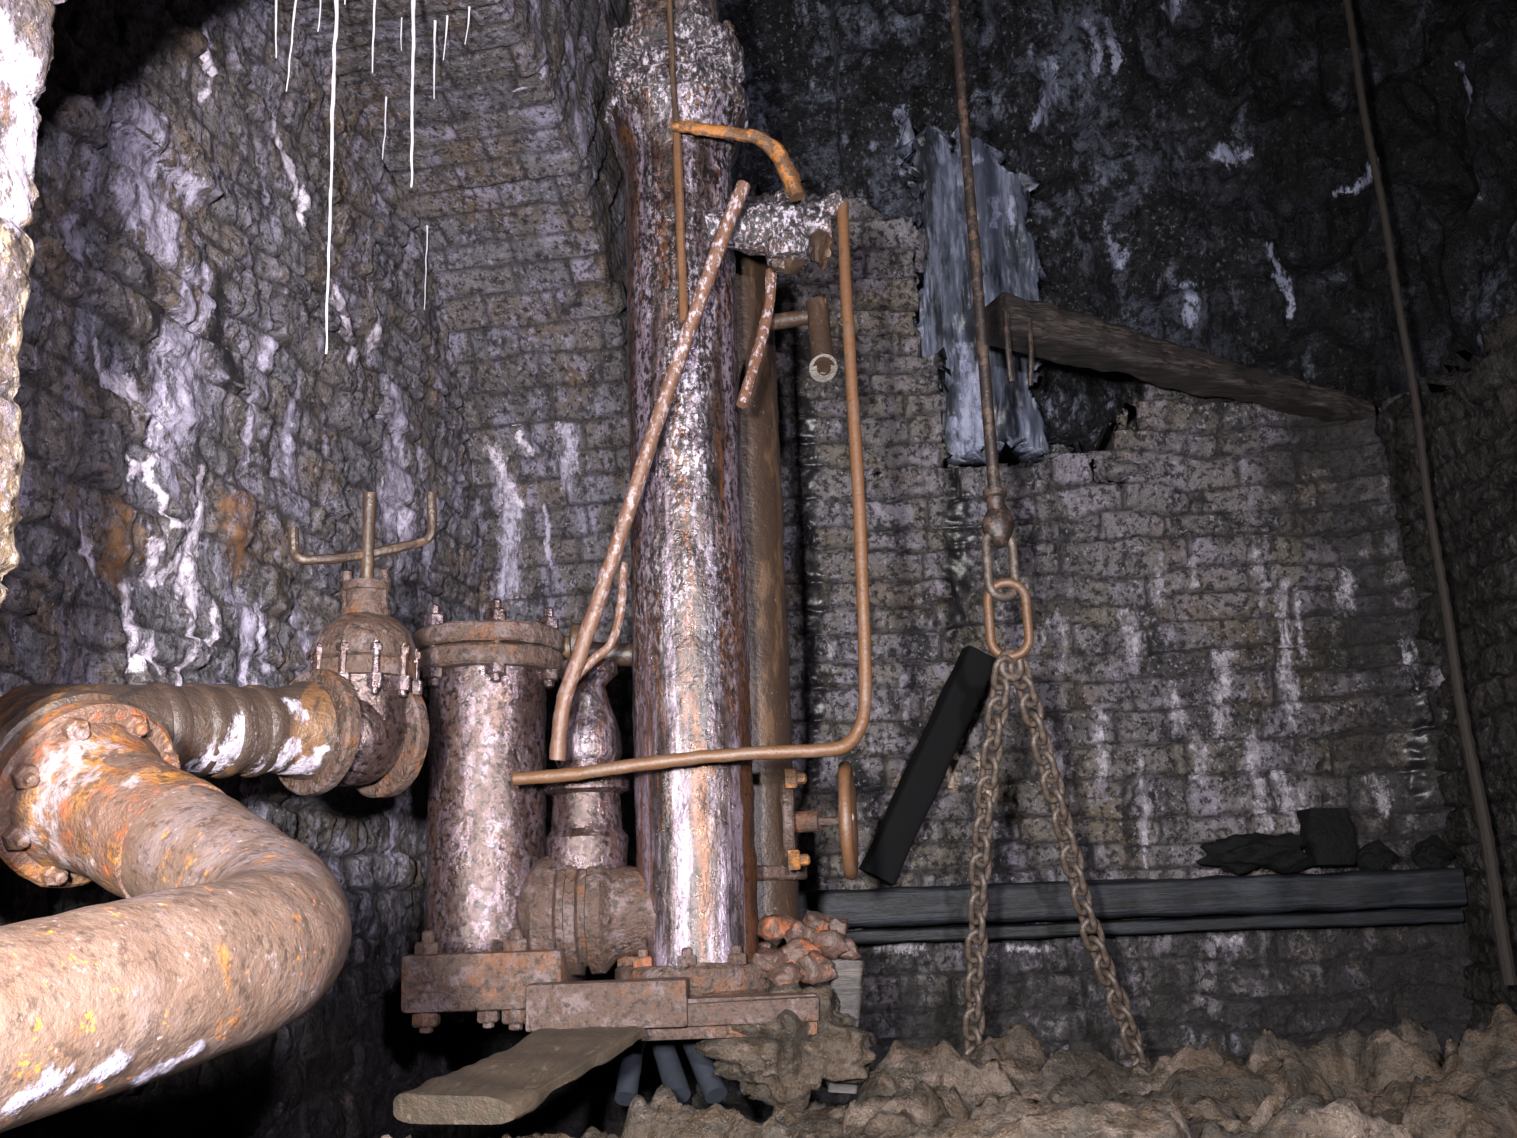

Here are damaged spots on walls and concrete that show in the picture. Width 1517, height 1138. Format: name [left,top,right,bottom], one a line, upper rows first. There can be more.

leakage [272,113,311,227]
leakage [0,9,45,608]
leakage [107,78,279,687]
leakage [281,397,296,488]
leakage [330,279,382,367]
leakage [373,377,444,590]
leakage [483,424,535,606]
leakage [542,505,554,569]
leakage [555,421,580,498]
leakage [1247,548,1305,727]
leakage [1136,759,1151,870]
leakage [1168,648,1312,834]